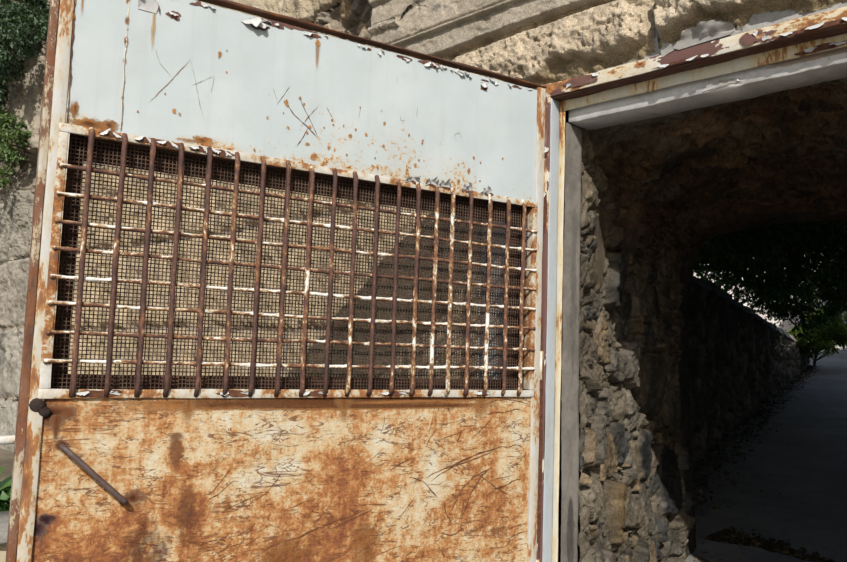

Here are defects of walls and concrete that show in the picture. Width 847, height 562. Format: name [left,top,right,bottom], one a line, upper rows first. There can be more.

peeling [138,0,181,21]
spalling [241,0,385,55]
crack [375,0,428,24]
spalling [509,0,847,92]
peeling [396,54,499,90]
rust [69,100,118,132]
rust [177,136,213,146]
rust [94,397,515,418]
rust [42,403,77,453]
rust [170,433,183,465]
rust [33,514,56,537]
crack [692,553,710,562]